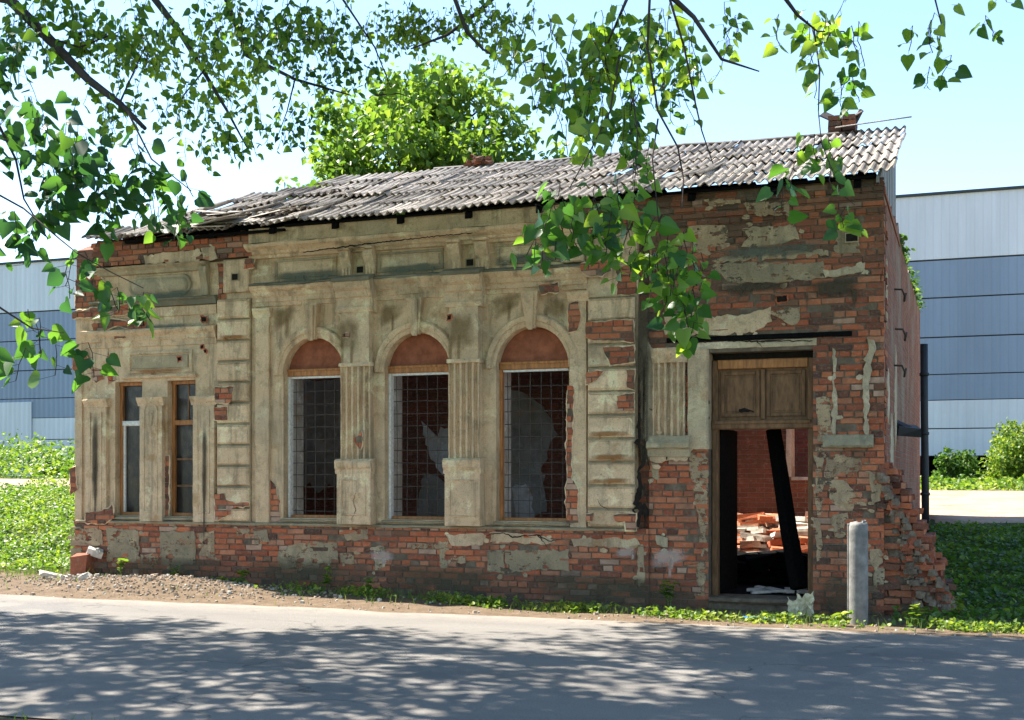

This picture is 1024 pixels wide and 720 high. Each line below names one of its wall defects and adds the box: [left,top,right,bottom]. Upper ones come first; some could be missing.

flaking render [143,244,227,300]
flaking render [663,198,868,336]
flaking render [213,385,234,422]
flaking render [511,301,709,596]
flaking render [810,338,882,561]
crack [487,533,557,545]
flaking render [409,512,646,587]
flaking render [868,544,889,586]